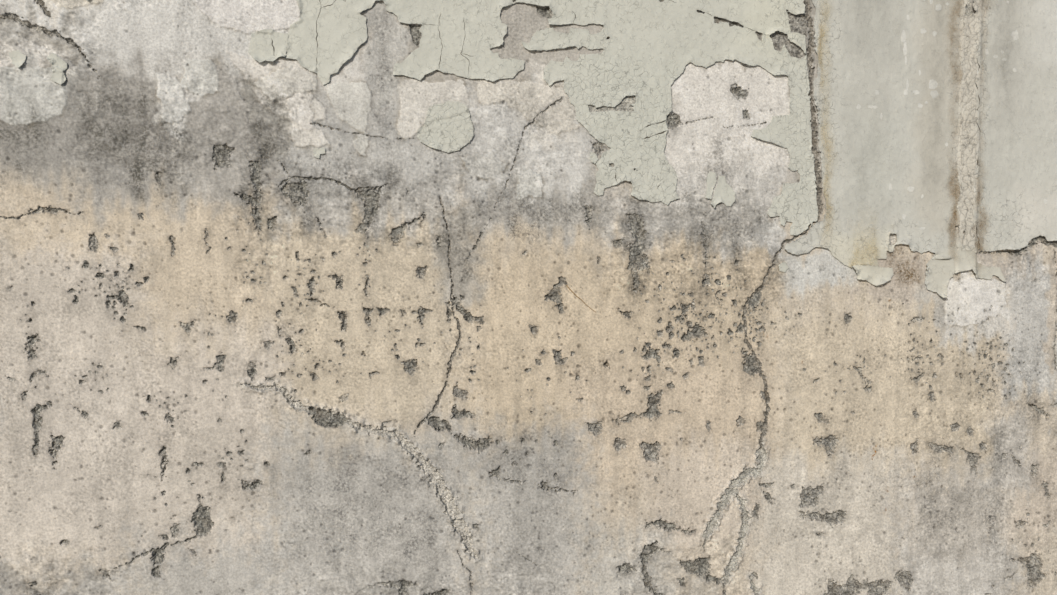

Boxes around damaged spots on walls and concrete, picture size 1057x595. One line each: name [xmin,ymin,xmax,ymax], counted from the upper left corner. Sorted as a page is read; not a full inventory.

crack [0,0,99,79]
crack [644,117,767,139]
spalling [28,205,61,215]
peeling [247,0,1057,409]
crack [976,223,1057,274]
crack [702,0,824,595]
crack [239,97,563,594]
crack [1049,310,1057,370]
spalling [813,412,839,457]
spalling [910,422,987,474]